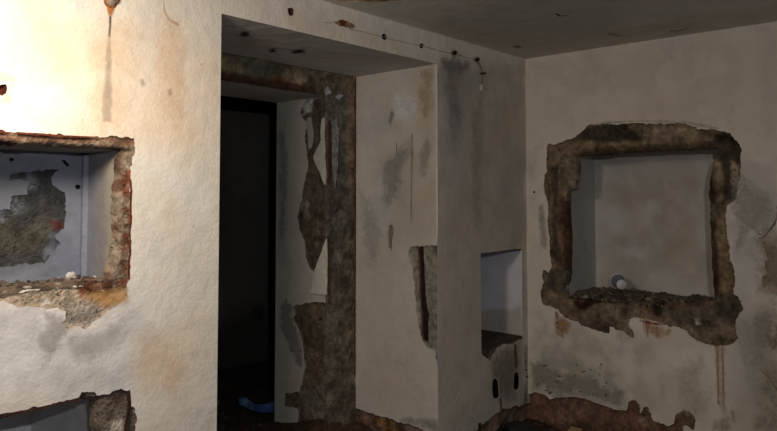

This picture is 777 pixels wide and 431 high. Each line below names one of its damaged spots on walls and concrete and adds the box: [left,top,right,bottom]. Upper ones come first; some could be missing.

peeling [306,117,339,187]
spalling [0,129,135,330]
peeling [310,238,328,295]
spalling [533,123,743,346]
spalling [408,245,438,369]
spalling [0,389,137,431]
flaking render [355,408,424,431]
flaking render [477,392,696,431]
rust [715,345,734,430]